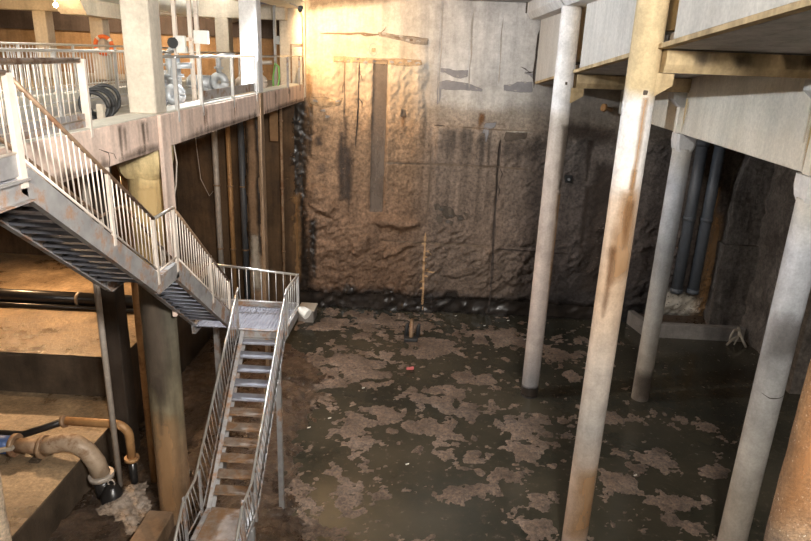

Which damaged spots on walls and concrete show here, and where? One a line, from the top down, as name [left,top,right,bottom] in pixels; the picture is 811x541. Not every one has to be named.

leakage [275,90,530,317]
rust [607,99,647,291]
leakage [546,302,594,320]
rust [572,473,596,533]